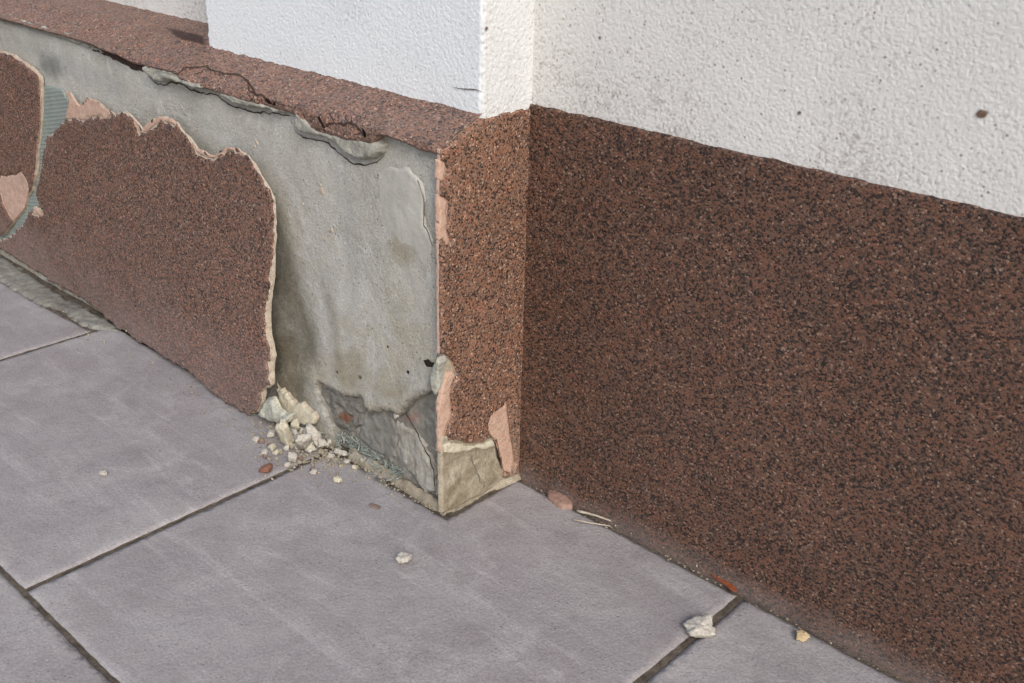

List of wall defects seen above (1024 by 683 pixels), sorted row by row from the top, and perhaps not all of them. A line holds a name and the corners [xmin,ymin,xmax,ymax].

peeling [0,19,514,513]
crack [142,62,383,166]